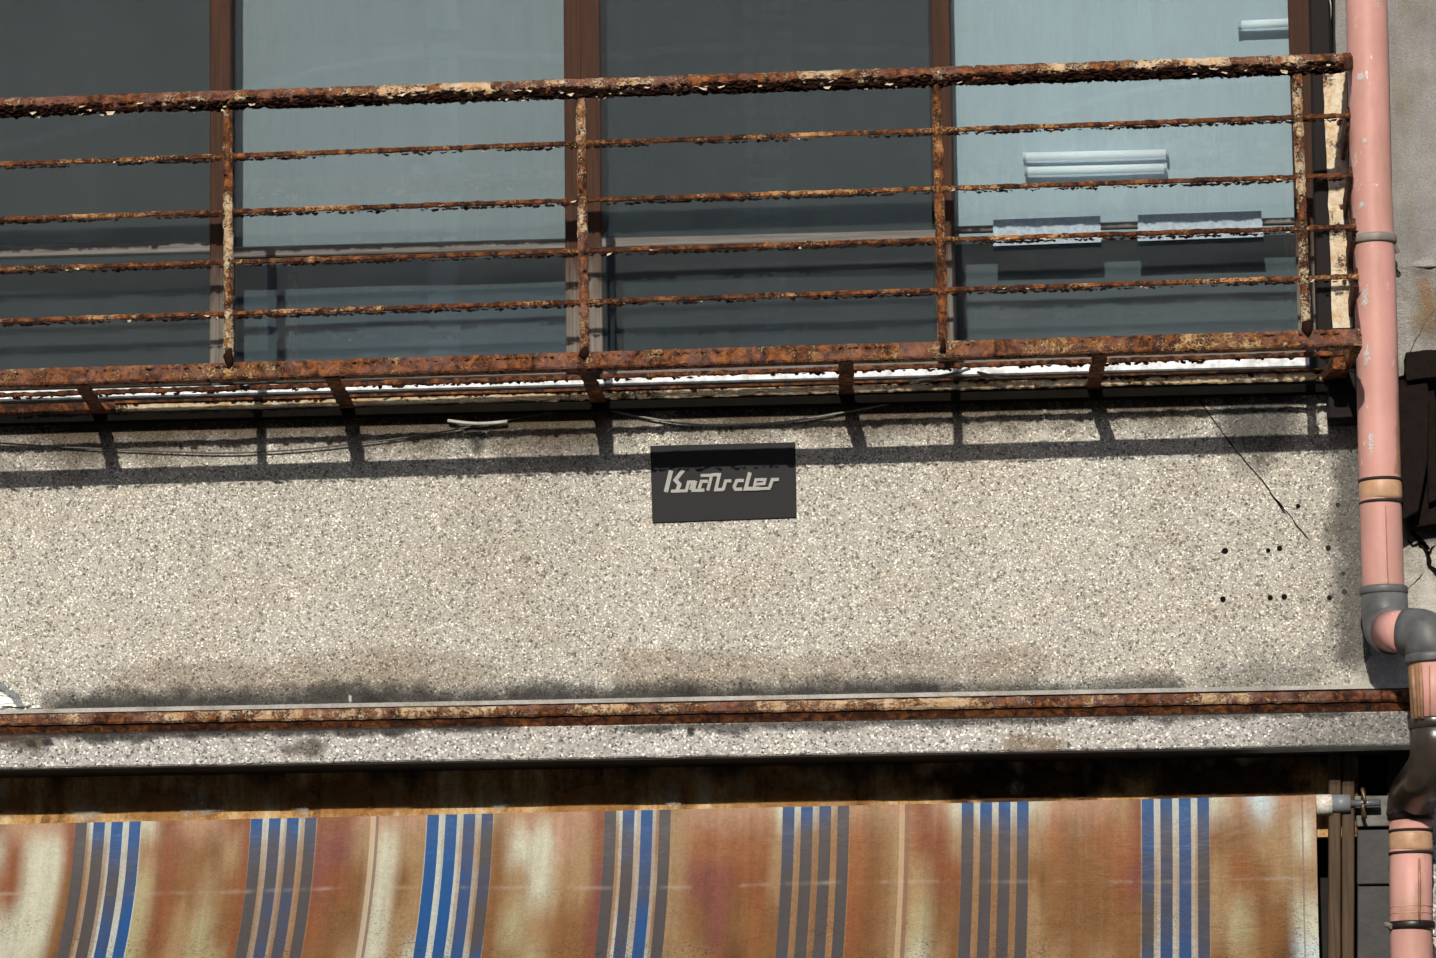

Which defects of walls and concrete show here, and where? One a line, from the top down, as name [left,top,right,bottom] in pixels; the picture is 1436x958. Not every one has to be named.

corrosion [0,60,1346,144]
corrosion [0,298,997,406]
crack [1197,399,1309,540]
crack [1408,530,1436,589]
spalling [0,682,42,709]
leakage [49,650,1182,709]
corrosion [127,789,213,821]
corrosion [292,777,410,817]
corrosion [551,784,630,812]
corrosion [735,783,876,807]
corrosion [914,761,1119,803]
corrosion [1155,759,1304,799]